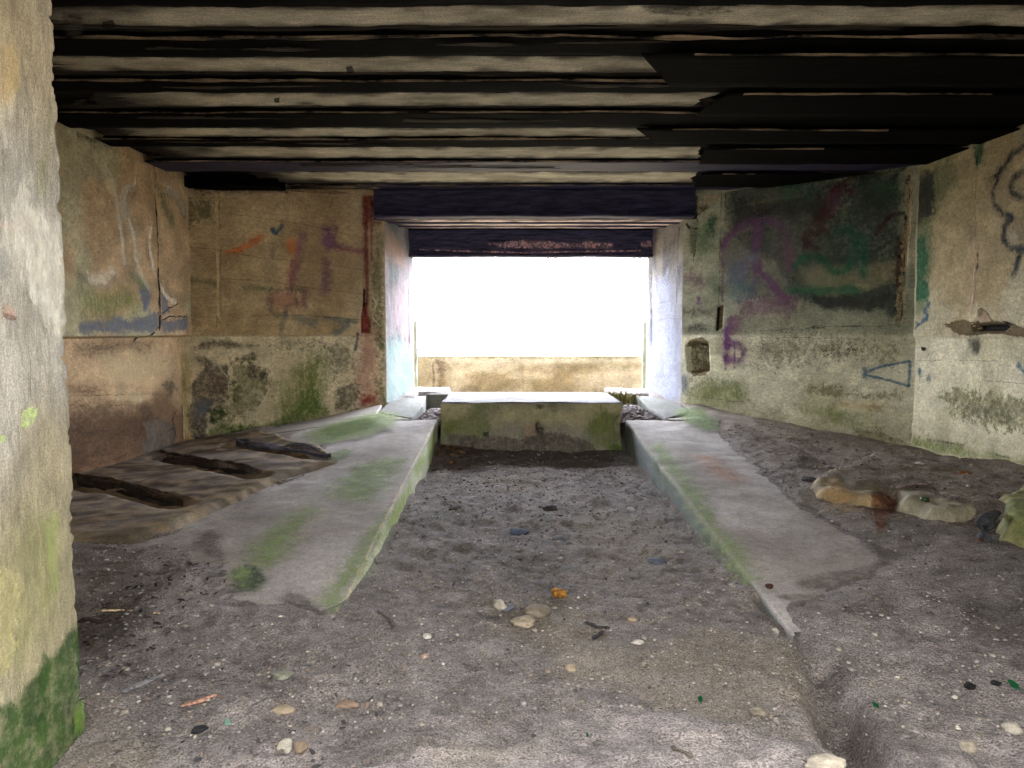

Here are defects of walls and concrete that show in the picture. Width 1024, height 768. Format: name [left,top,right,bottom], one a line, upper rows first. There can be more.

crack [133,165,186,342]
water stain [198,335,361,422]